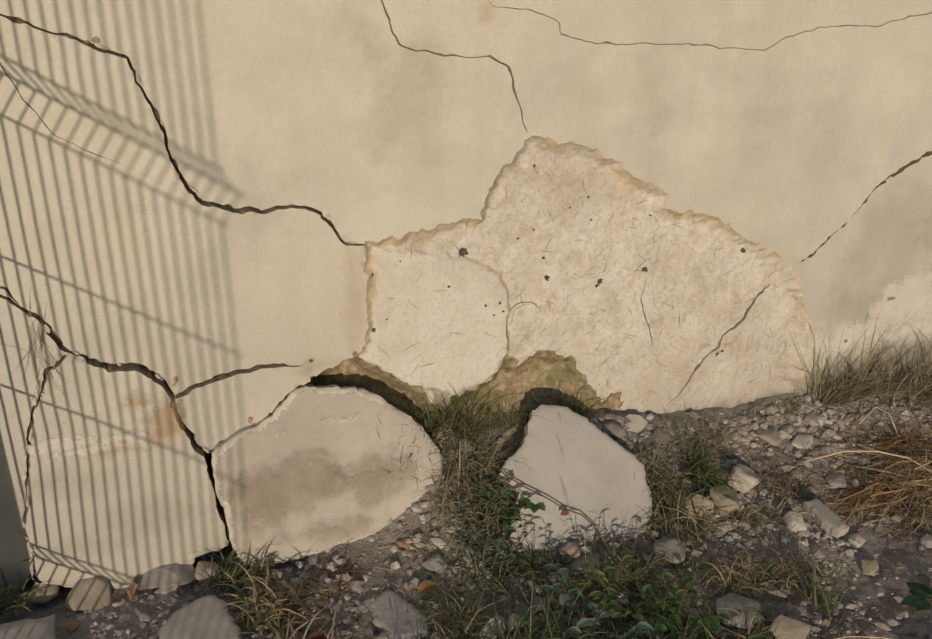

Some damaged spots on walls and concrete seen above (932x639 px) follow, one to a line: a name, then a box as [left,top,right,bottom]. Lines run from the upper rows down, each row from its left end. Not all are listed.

crack [0,14,365,246]
crack [381,0,527,131]
crack [489,1,932,51]
crack [802,151,932,262]
spalling [352,136,813,414]
crack [669,284,771,404]
crack [0,286,311,541]
crack [10,546,43,583]